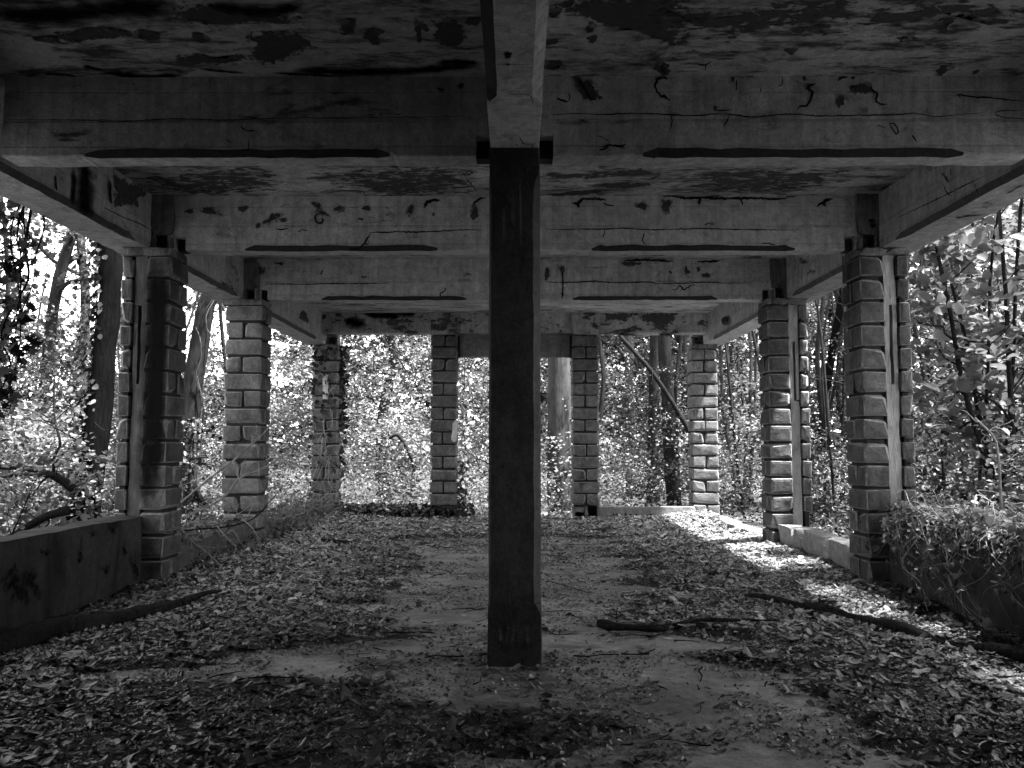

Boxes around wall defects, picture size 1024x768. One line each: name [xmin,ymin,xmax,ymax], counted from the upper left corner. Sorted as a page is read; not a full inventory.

crack [513,58,1024,170]
crack [350,198,479,250]
crack [548,175,833,299]